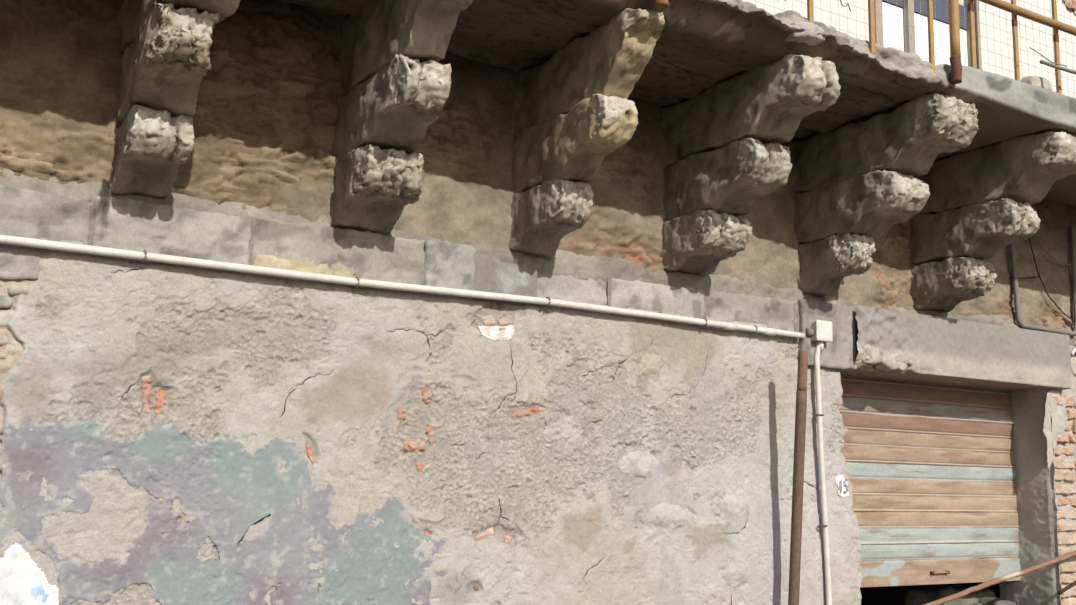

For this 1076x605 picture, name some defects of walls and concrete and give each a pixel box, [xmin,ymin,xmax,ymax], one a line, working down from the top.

spalling [479,315,515,341]
spalling [512,406,544,420]
peeling [0,375,479,605]